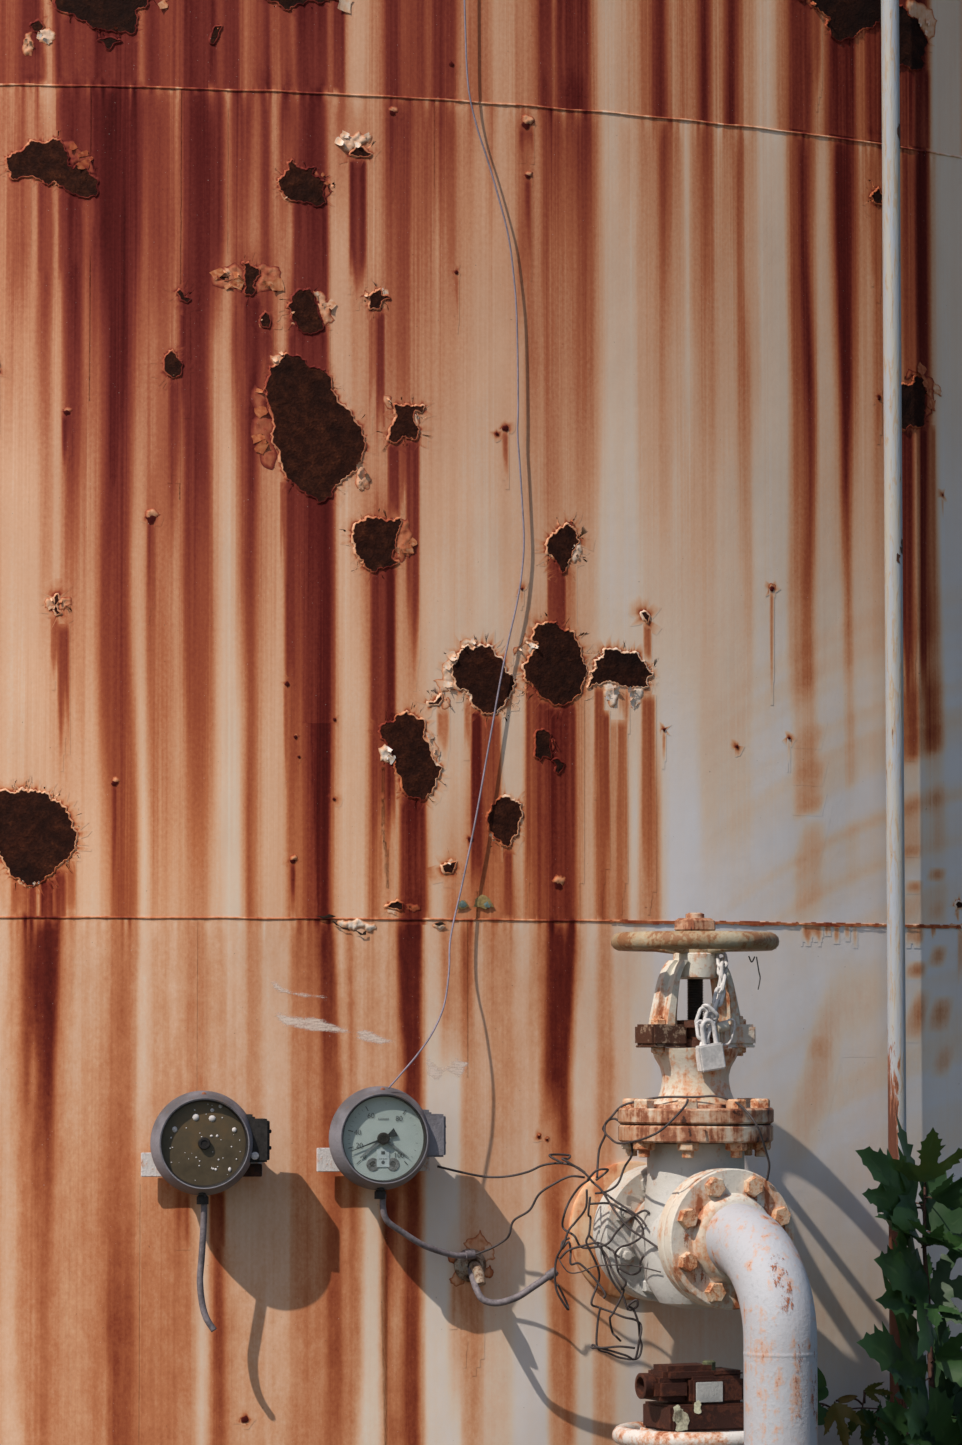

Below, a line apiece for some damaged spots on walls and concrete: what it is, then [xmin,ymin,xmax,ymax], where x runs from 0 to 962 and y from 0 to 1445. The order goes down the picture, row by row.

rust [0,0,333,1445]
rust [371,490,387,514]
rust [379,0,485,399]
rust [518,16,596,418]
rust [781,0,883,685]
rust [897,124,932,383]
rust [904,625,939,762]
rust [368,666,581,1445]
rust [771,1254,793,1314]